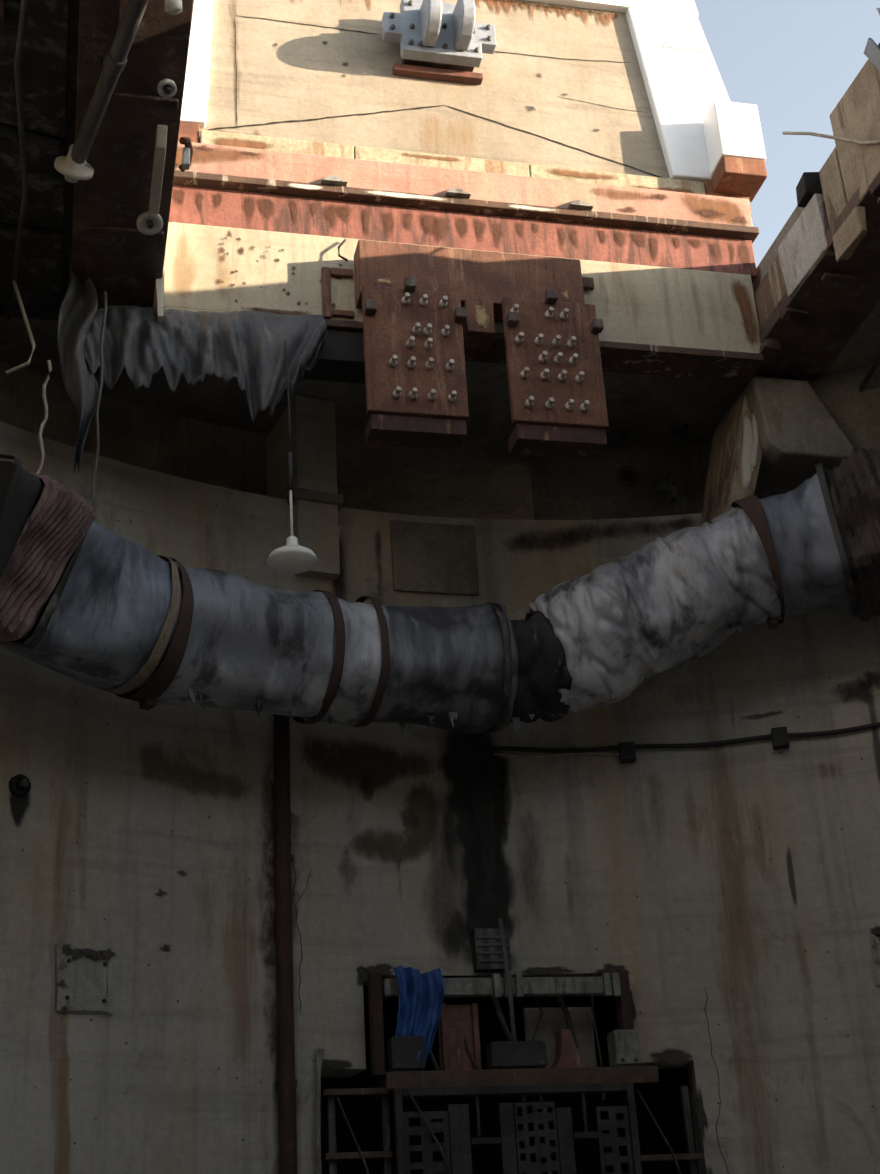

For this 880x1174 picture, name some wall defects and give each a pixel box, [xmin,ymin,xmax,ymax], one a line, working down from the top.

rust [402,153,458,161]
rust [553,169,747,225]
rust [558,228,578,247]
rust [599,231,658,259]
rust [674,237,749,265]
damp [837,672,880,780]
damp [305,731,514,962]
crack [704,988,729,1174]